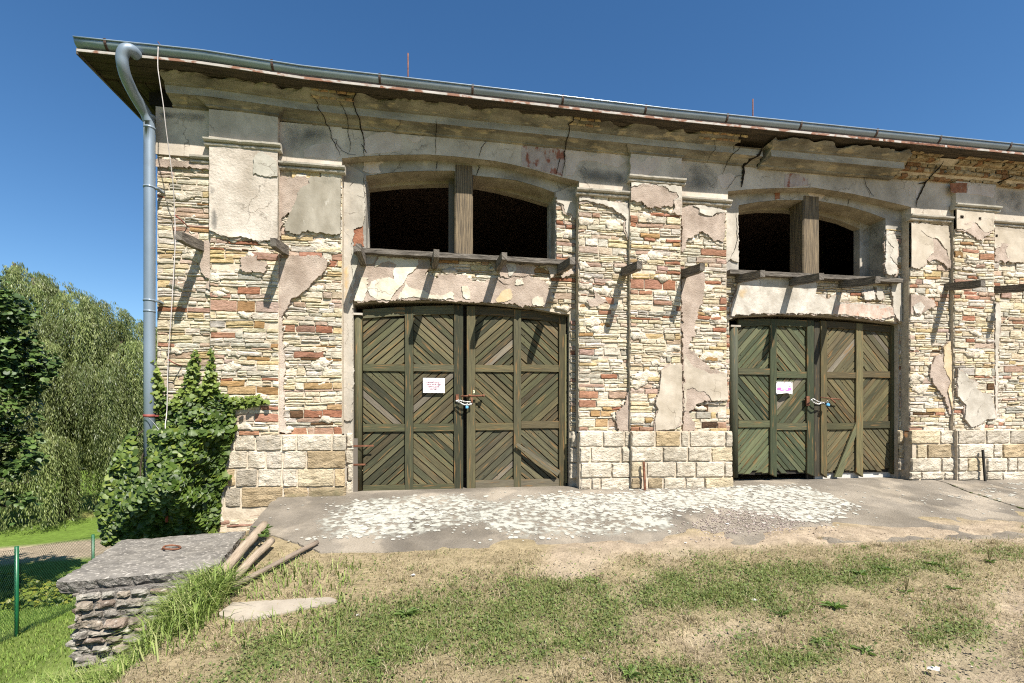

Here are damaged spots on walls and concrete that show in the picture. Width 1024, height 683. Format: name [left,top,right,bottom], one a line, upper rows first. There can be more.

peeling [156,146,341,434]
crack [310,93,367,155]
peeling [349,226,574,308]
crack [556,117,574,174]
peeling [521,146,726,252]
crack [707,141,763,188]
peeling [729,151,1024,322]
crack [916,161,944,237]
peeling [653,272,728,432]
peeling [928,302,1001,428]